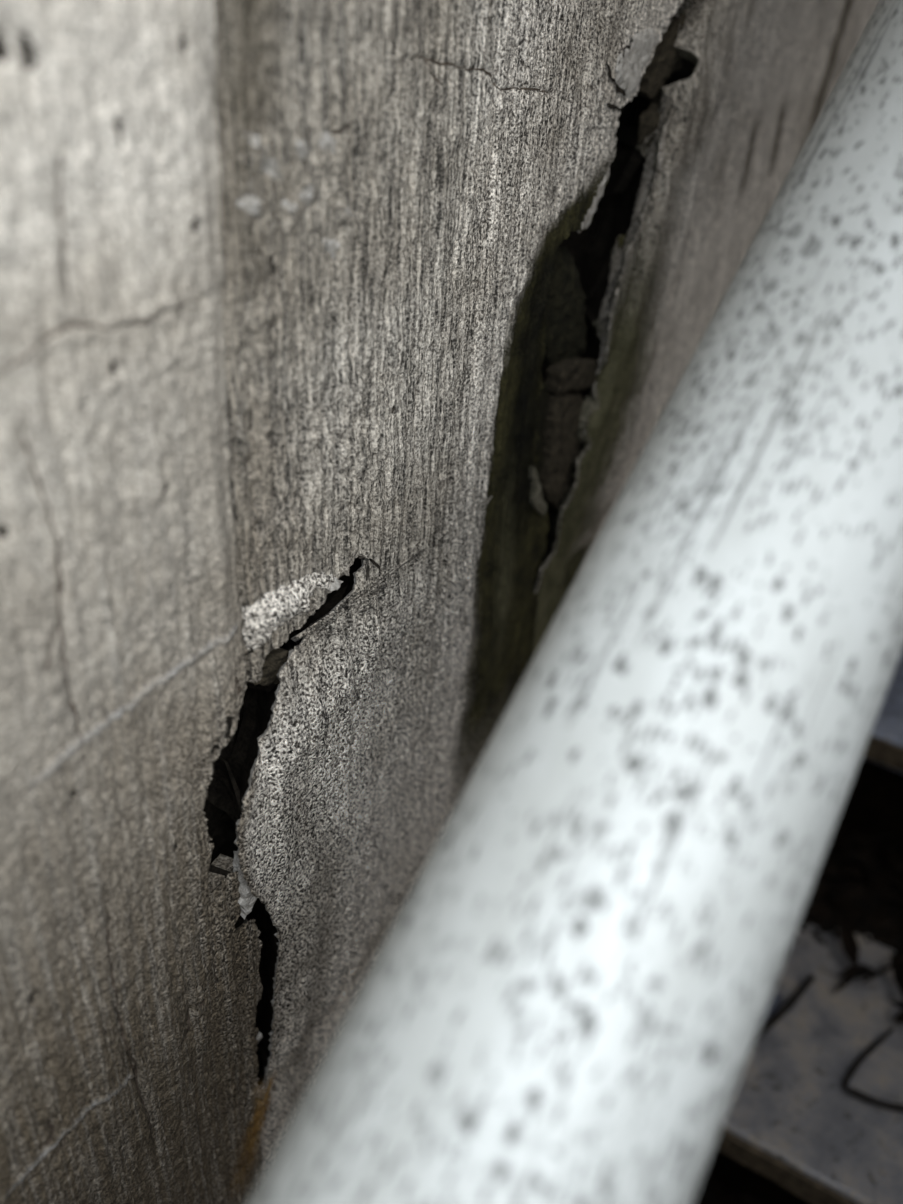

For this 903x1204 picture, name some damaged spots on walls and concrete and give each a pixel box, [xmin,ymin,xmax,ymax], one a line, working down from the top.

spalling [241,572,343,650]
leakage [492,246,558,650]
leakage [530,278,653,663]
crack [528,0,692,617]
crack [203,555,388,1089]